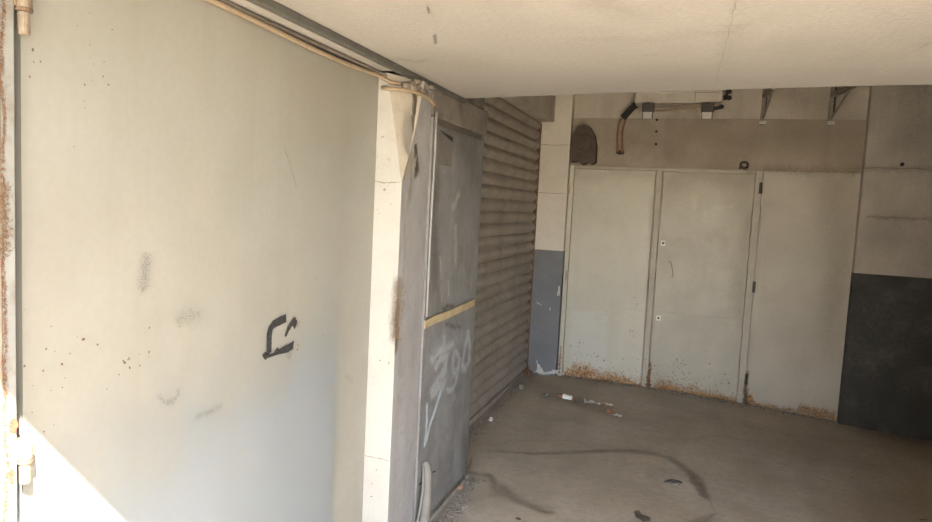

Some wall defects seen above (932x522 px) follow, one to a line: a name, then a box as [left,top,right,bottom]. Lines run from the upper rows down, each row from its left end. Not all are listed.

corrosion [558,342,838,421]
damp [484,448,719,522]